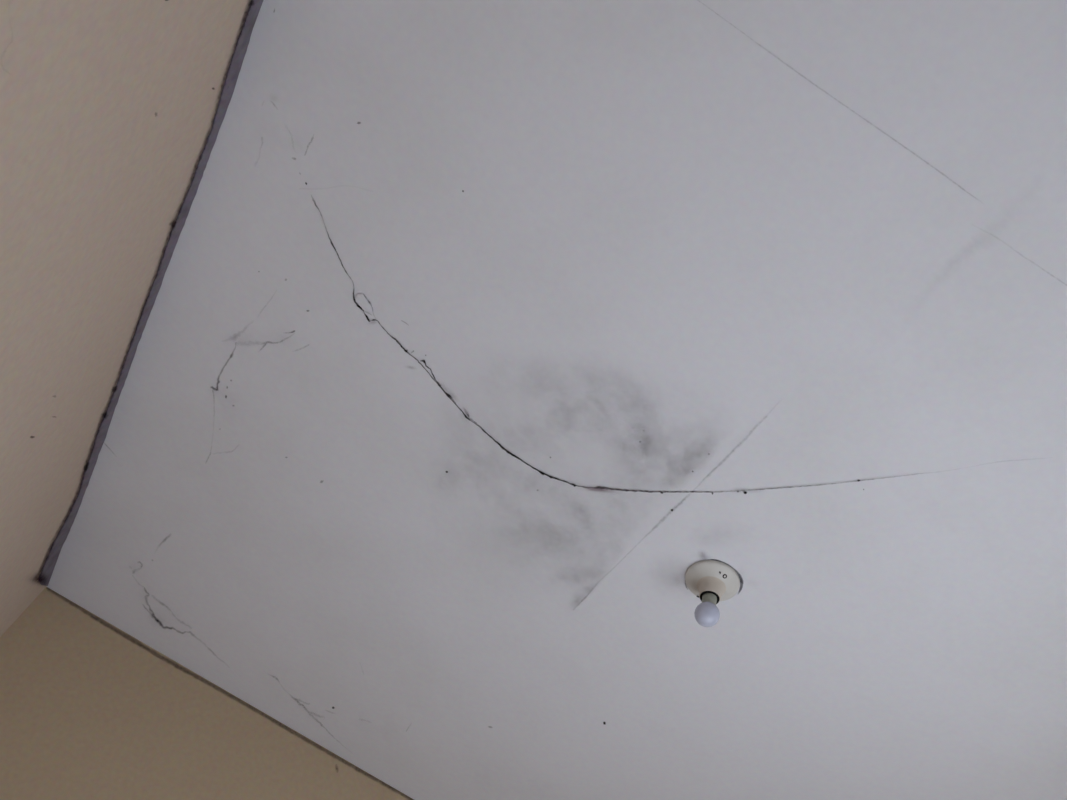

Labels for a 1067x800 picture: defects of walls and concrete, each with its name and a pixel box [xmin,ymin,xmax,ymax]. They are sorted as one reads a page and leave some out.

crack [39,0,409,798]
crack [328,235,811,592]